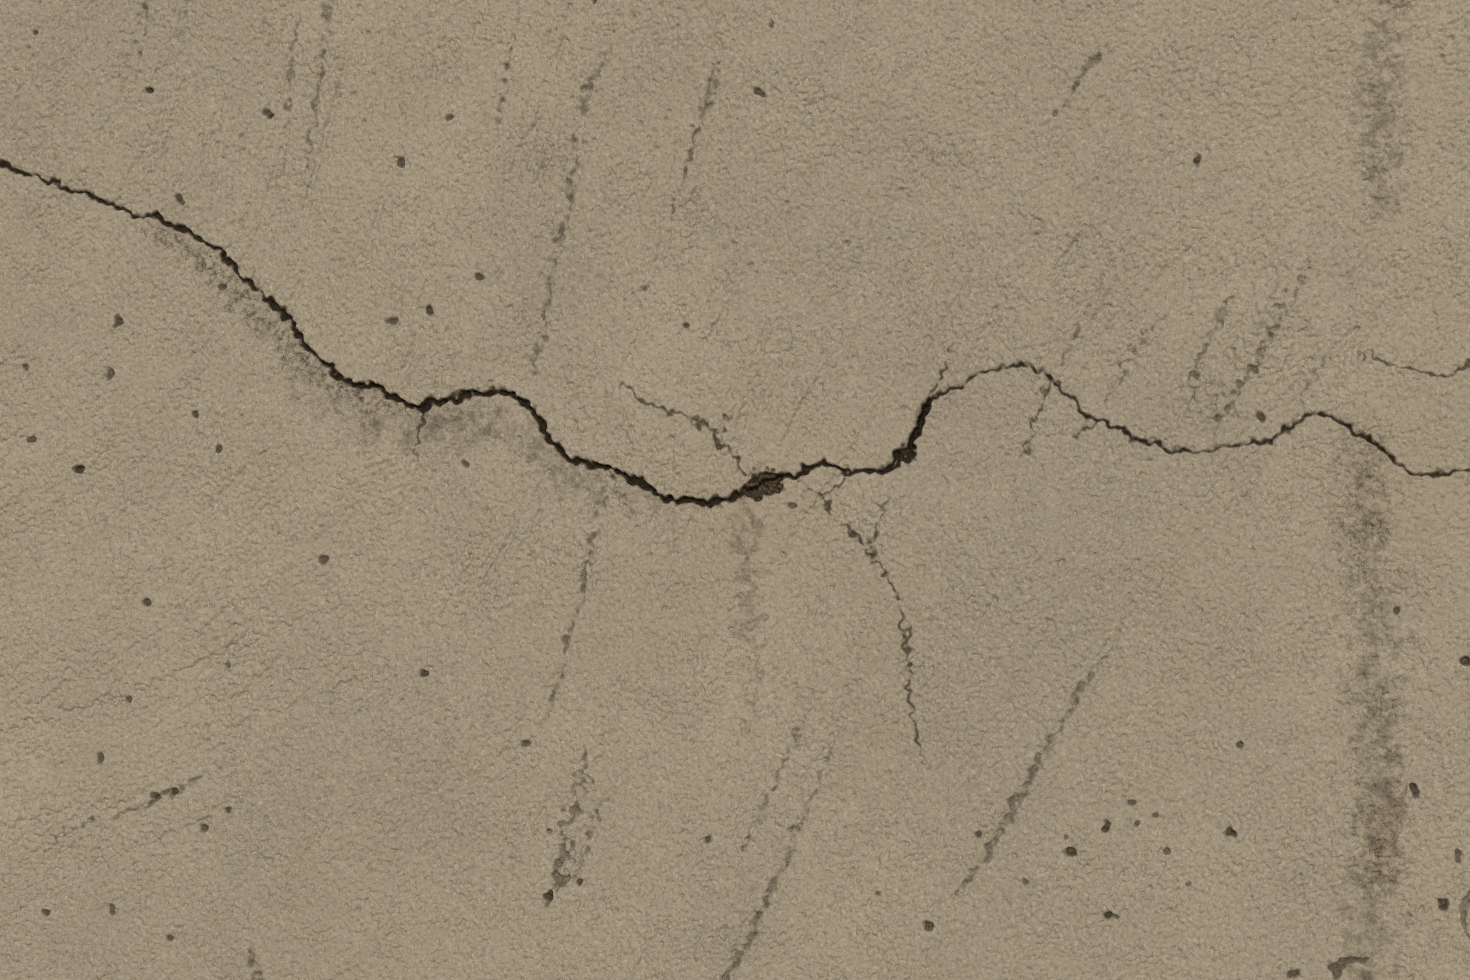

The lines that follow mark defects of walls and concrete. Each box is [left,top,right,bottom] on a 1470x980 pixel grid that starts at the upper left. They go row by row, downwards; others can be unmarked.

crack [0,161,1470,756]